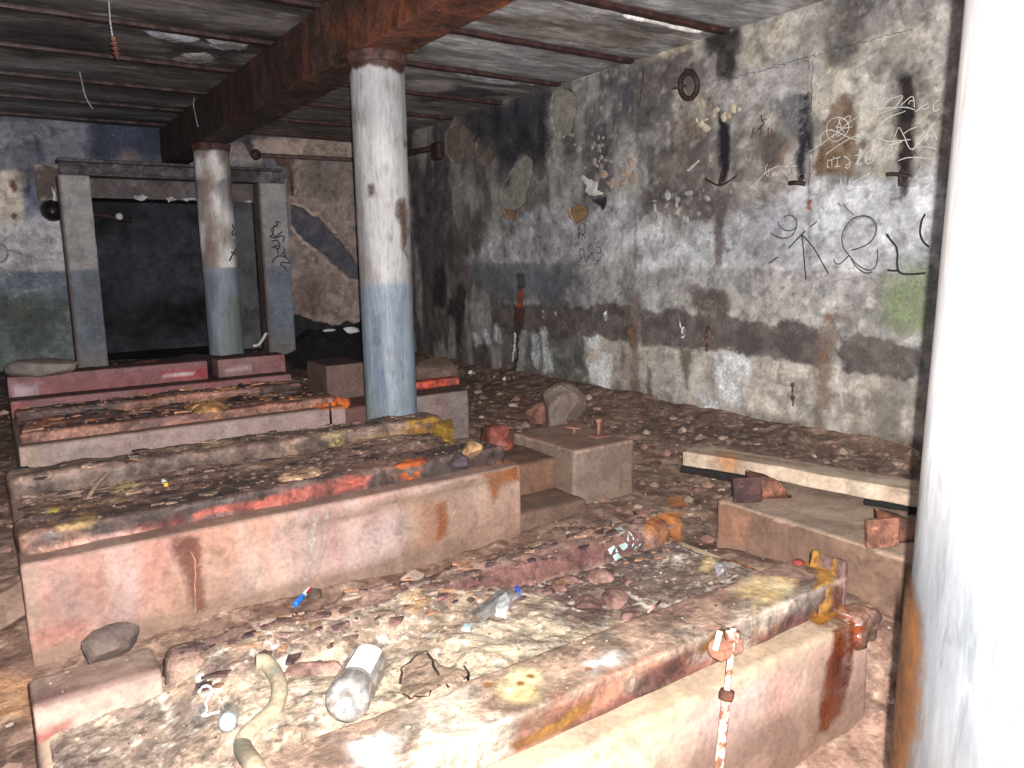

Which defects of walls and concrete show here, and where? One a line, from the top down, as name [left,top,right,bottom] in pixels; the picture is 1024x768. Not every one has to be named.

water stain [899,76,916,105]
flaking render [445,120,476,165]
flaking render [499,155,534,221]
flaking render [549,87,638,225]
flaking render [290,201,359,281]
rust [396,199,408,255]
water stain [433,263,821,409]
water stain [837,334,920,381]
rust [437,502,447,537]
rust [174,538,203,612]
rust [804,549,865,731]
rust [889,583,922,768]